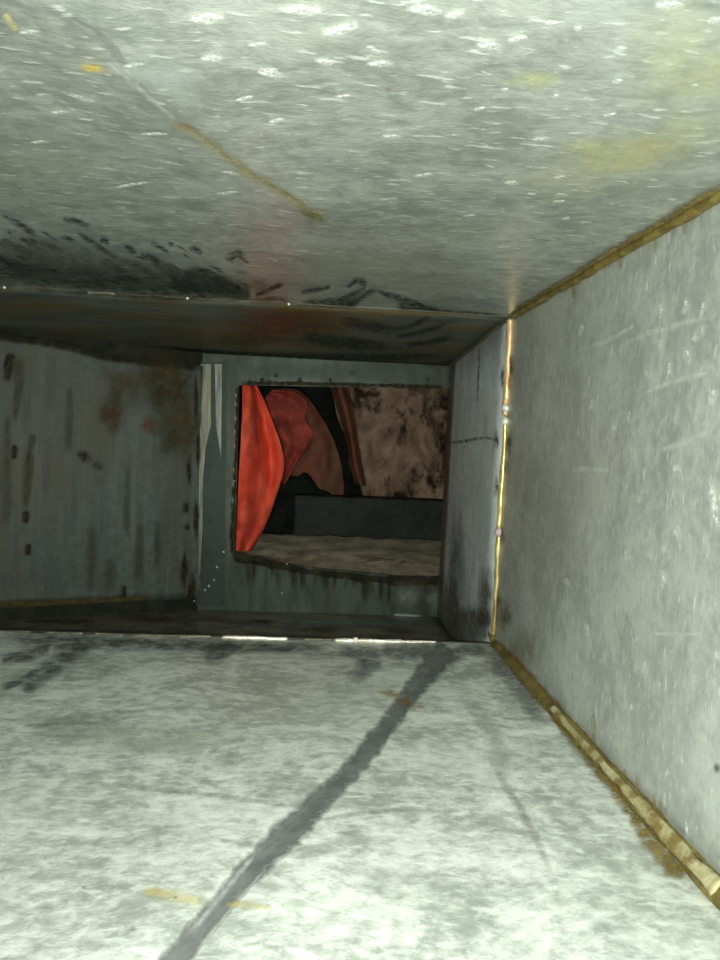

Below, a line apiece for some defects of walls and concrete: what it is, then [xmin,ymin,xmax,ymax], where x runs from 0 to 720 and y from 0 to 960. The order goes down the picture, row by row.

leakage [0,216,248,298]
rust [0,333,198,416]
rust [187,436,200,481]
rust [184,504,199,535]
rust [181,553,196,602]